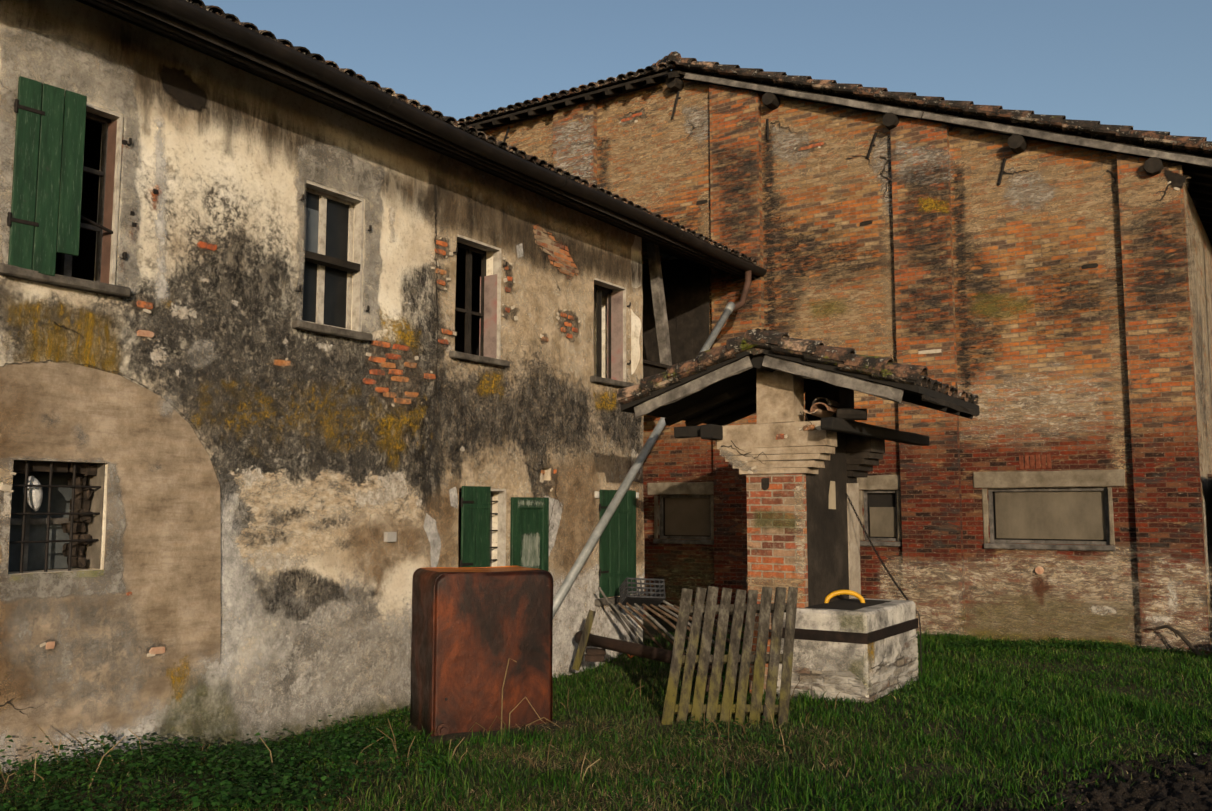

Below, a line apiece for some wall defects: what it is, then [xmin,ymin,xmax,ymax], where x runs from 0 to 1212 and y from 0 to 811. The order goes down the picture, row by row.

damp [0,0,679,299]
flaking render [362,339,436,411]
flaking render [431,237,453,293]
flaking render [502,258,532,321]
flaking render [533,224,580,280]
flaking render [540,308,580,344]
damp [711,133,894,331]
damp [896,165,1007,388]
flaking render [230,465,426,576]
damp [40,441,464,765]
corrosion [1029,576,1052,605]
damp [879,547,1211,651]